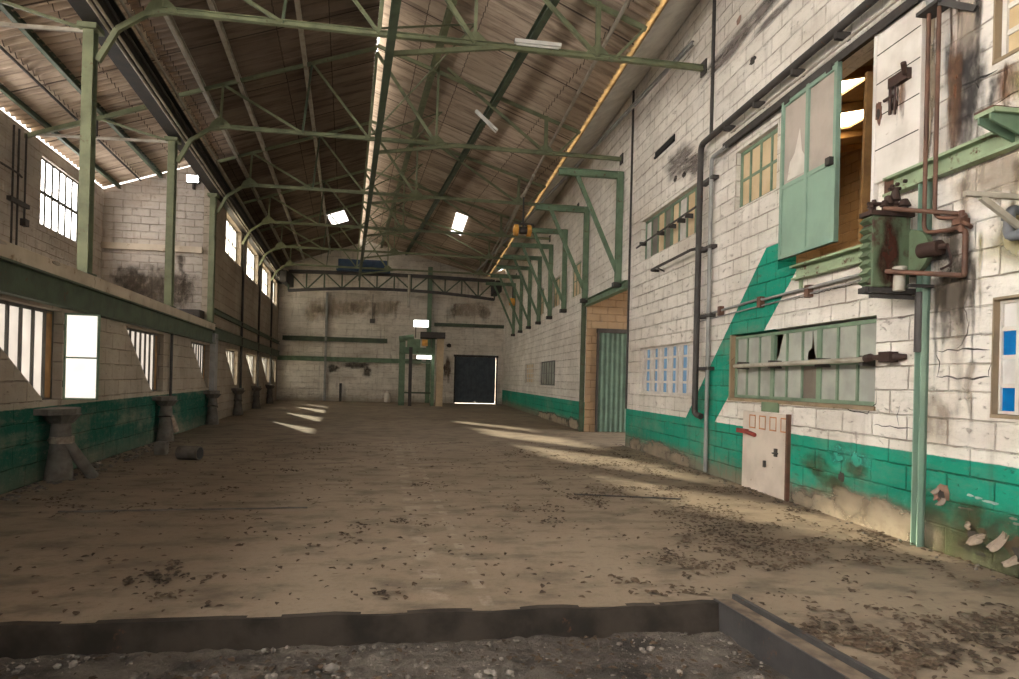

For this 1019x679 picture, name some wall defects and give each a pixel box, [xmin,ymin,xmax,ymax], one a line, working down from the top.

leakage [946,43,997,143]
rust [877,219,899,283]
crack [936,321,991,380]
peeling [791,452,911,541]
spalling [930,484,950,506]
spalling [964,517,1019,568]